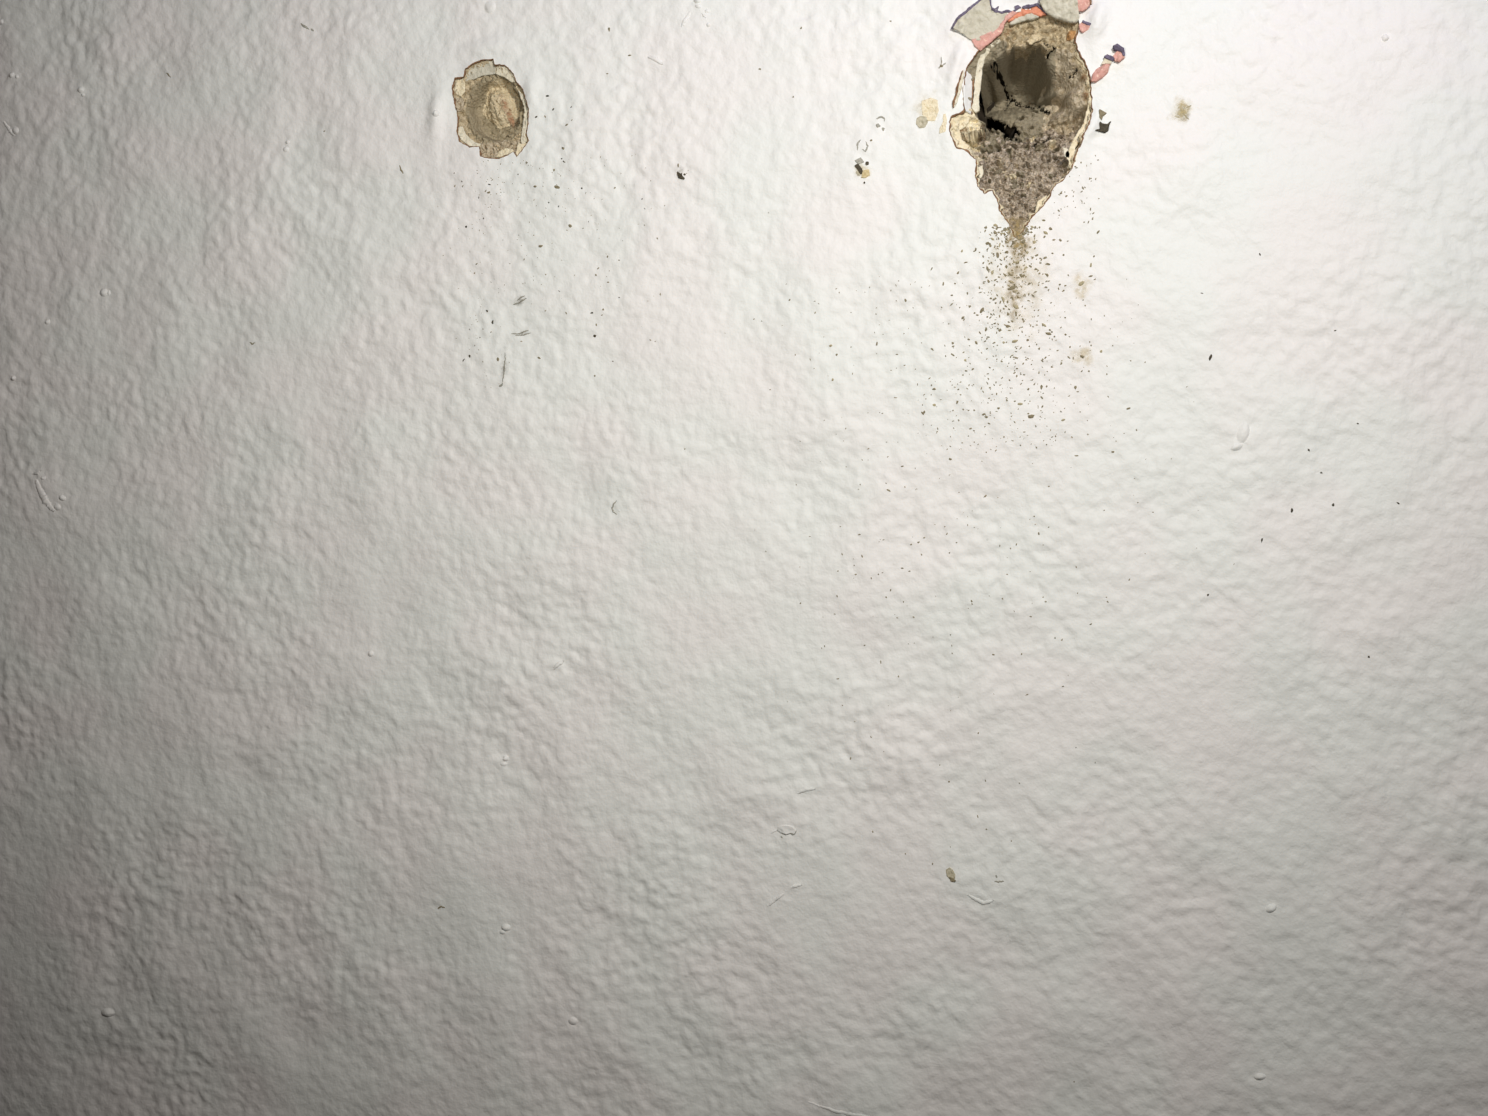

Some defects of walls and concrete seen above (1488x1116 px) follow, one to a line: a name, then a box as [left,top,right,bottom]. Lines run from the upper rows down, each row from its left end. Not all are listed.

spalling [452,59,529,159]
spalling [916,0,1125,238]